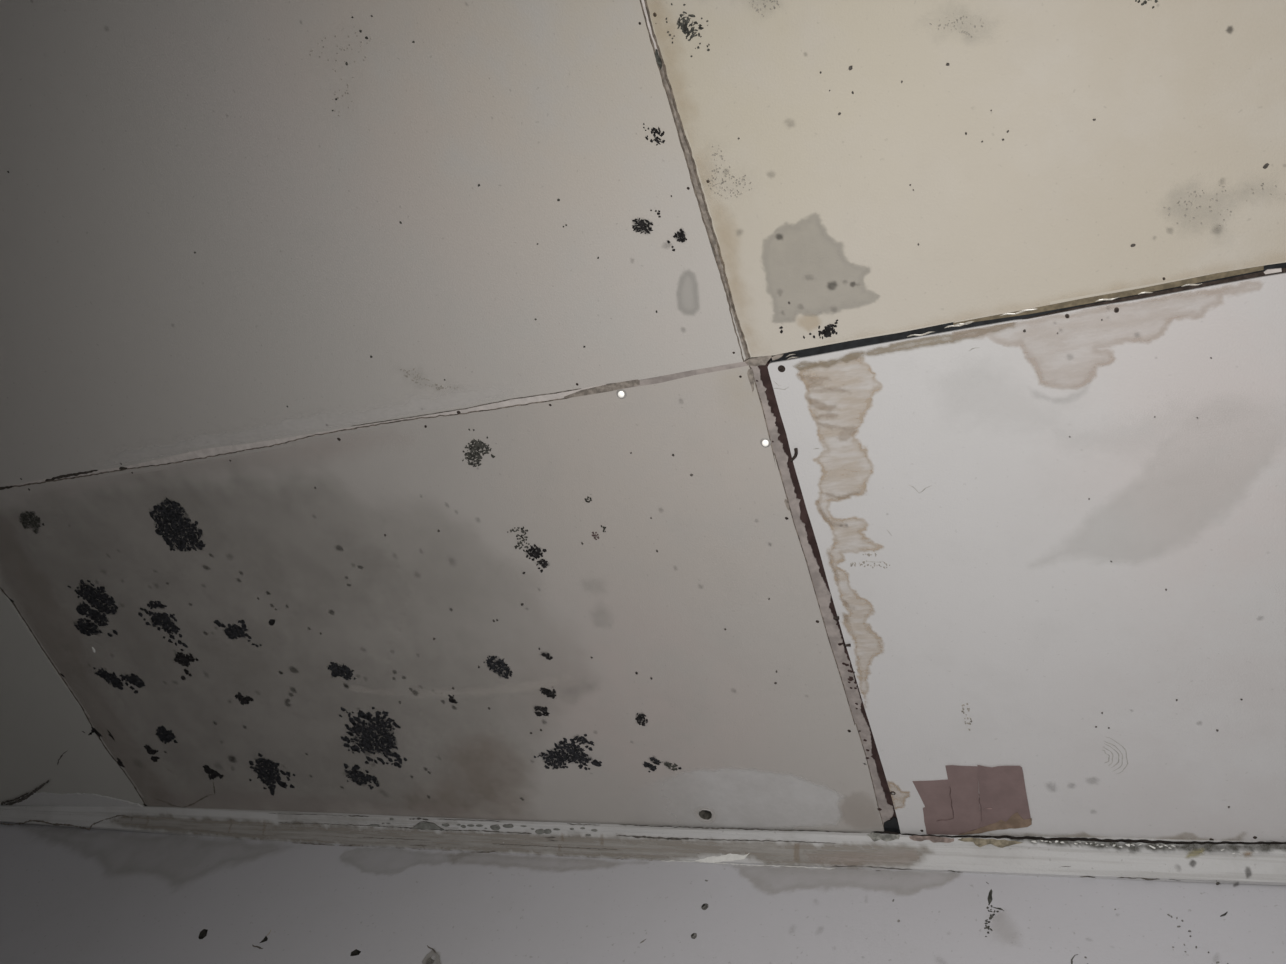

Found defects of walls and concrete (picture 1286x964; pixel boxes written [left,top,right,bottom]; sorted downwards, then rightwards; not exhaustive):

water stain [462,429,495,467]
water stain [149,498,206,552]
water stain [507,526,548,574]
water stain [68,580,119,637]
water stain [138,601,198,680]
water stain [93,667,145,694]
water stain [328,662,356,687]
water stain [478,656,513,679]
water stain [530,688,557,734]
water stain [231,753,295,796]
water stain [339,707,426,790]
water stain [534,734,602,770]